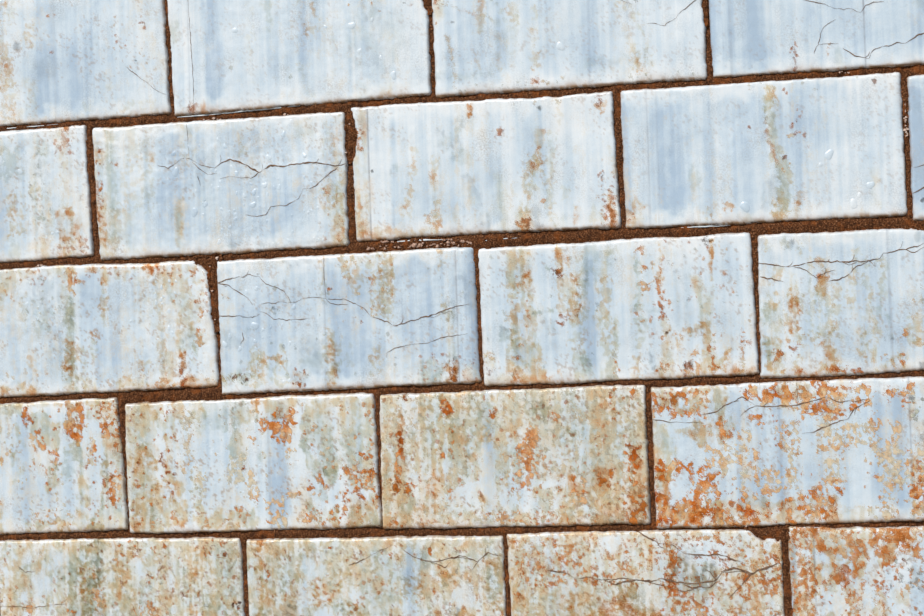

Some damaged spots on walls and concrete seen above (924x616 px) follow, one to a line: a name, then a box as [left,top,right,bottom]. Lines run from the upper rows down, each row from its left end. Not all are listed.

crack [806,0,924,59]
crack [158,124,345,217]
rust [66,267,77,296]
crack [218,272,468,351]
rust [640,278,667,320]
crack [760,241,922,281]
rust [656,345,720,378]
crack [653,393,870,434]
rust [0,351,924,616]
crack [548,531,780,598]